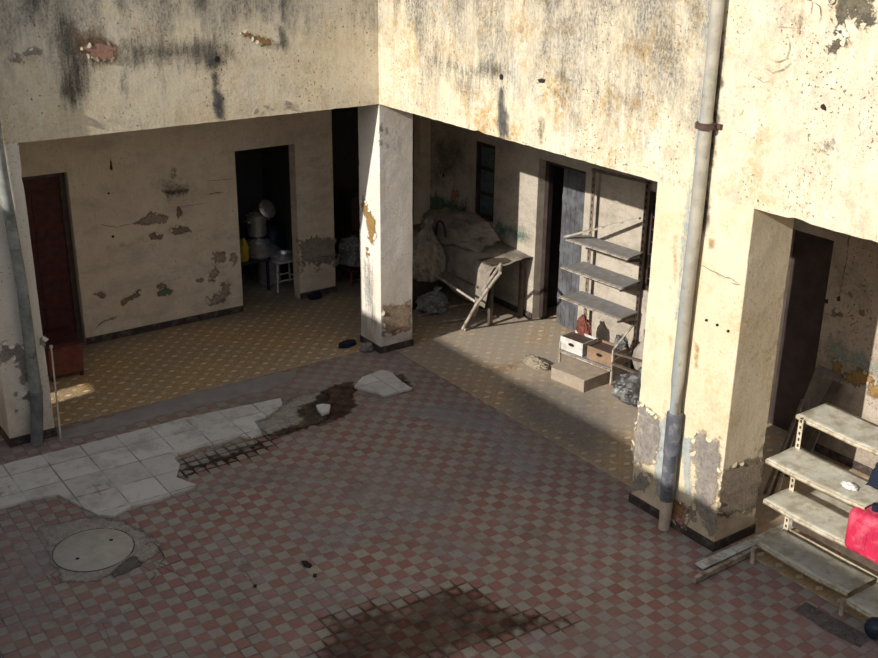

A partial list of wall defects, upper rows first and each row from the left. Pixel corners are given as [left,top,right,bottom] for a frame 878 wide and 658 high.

leakage [55,18,89,104]
leakage [132,37,232,119]
leakage [478,66,509,137]
peeling [823,0,876,55]
peeling [100,207,192,240]
peeling [362,195,377,258]
spalling [381,300,412,337]
peeling [0,340,30,401]
peeling [832,359,878,398]
peeling [630,401,660,493]
peeling [671,430,765,538]
leakage [317,584,548,658]